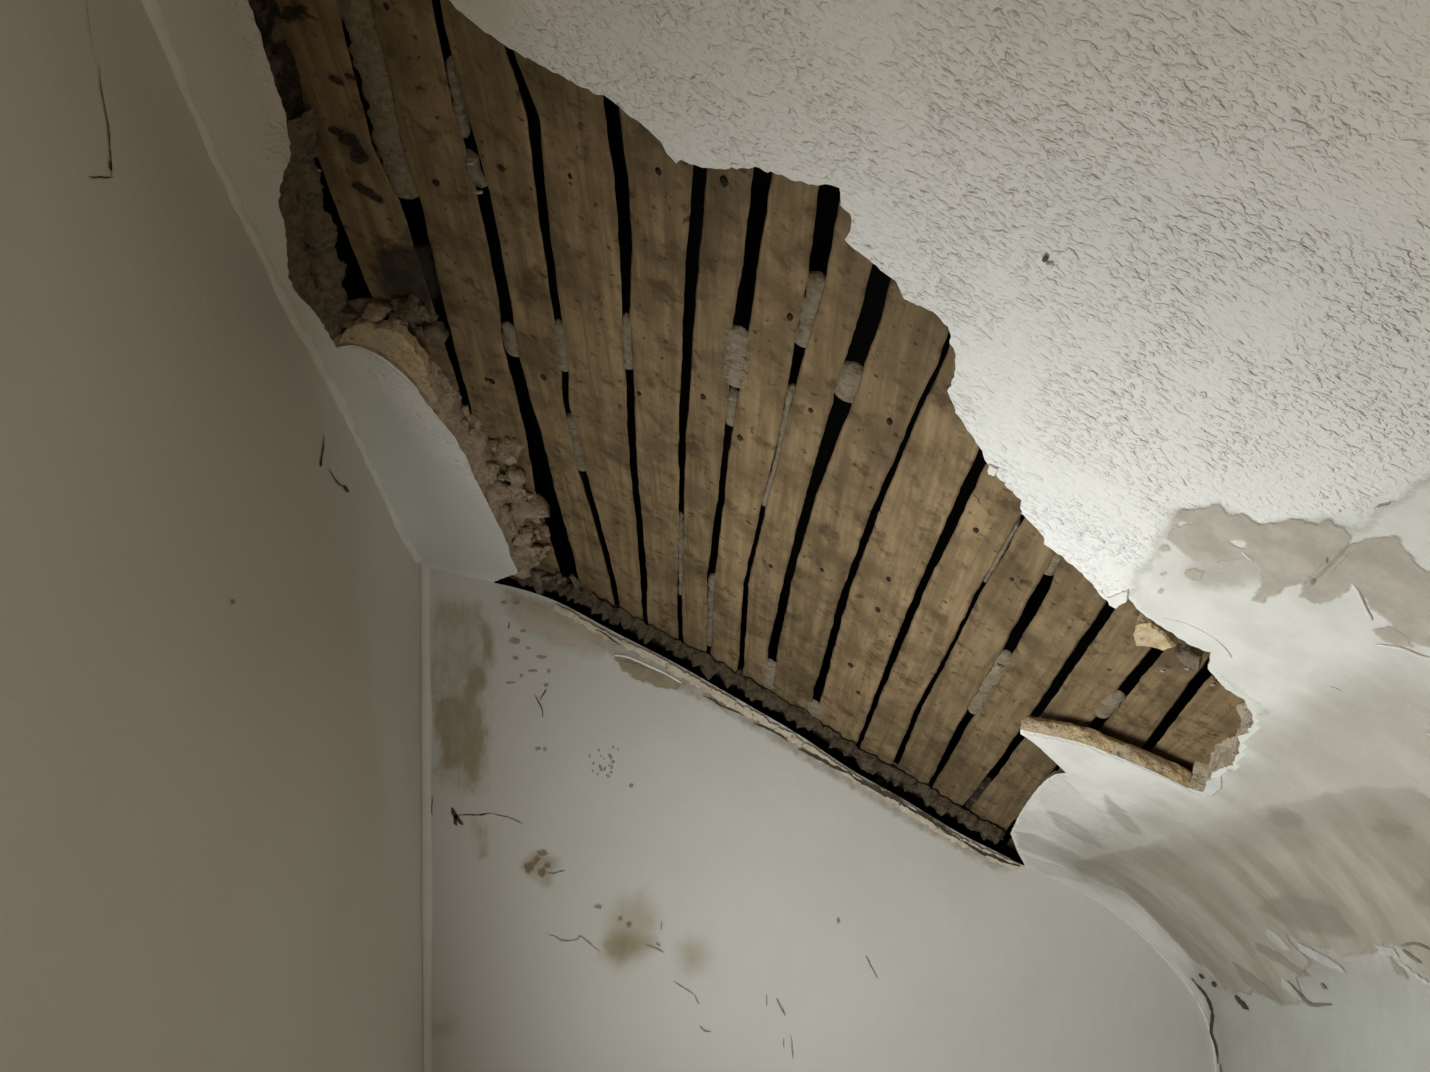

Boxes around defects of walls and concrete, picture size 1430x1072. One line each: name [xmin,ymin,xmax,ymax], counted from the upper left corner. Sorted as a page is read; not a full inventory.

spalling [248,0,1023,870]
flaking render [1013,479,1430,1072]
leakage [1023,710,1430,1010]